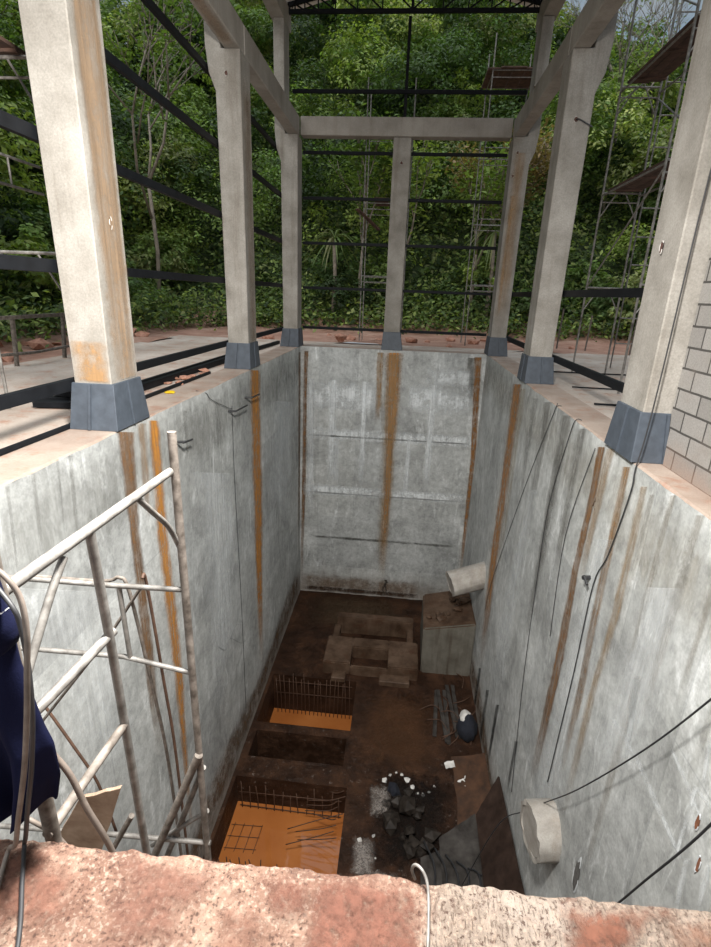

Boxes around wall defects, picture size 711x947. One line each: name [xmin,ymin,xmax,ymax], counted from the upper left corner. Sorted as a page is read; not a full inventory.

corrosion [119,420,187,772]
corrosion [251,370,262,618]
corrosion [376,353,399,541]
corrosion [486,384,521,611]
corrosion [539,447,613,743]
corrosion [575,467,629,709]